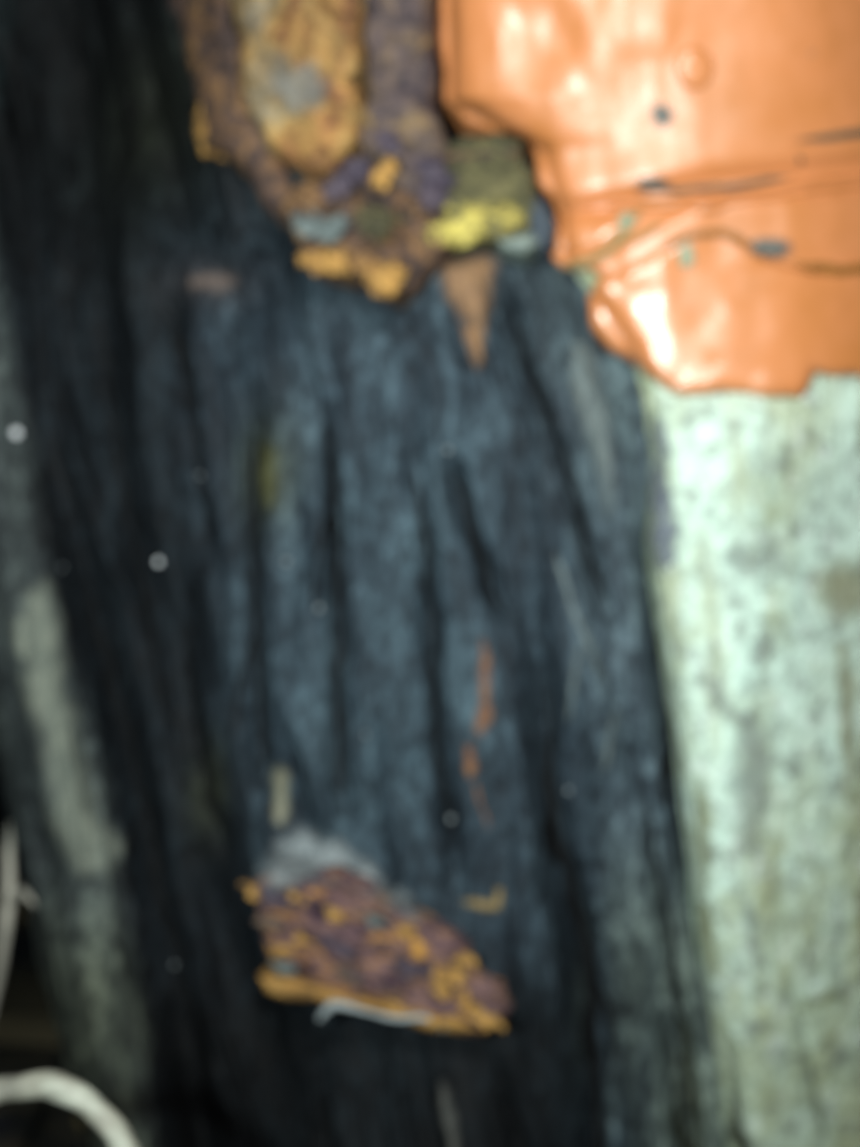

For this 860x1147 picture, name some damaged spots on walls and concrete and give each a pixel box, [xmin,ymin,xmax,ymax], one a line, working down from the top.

corrosion [425,132,556,362]
peeling [437,0,860,277]